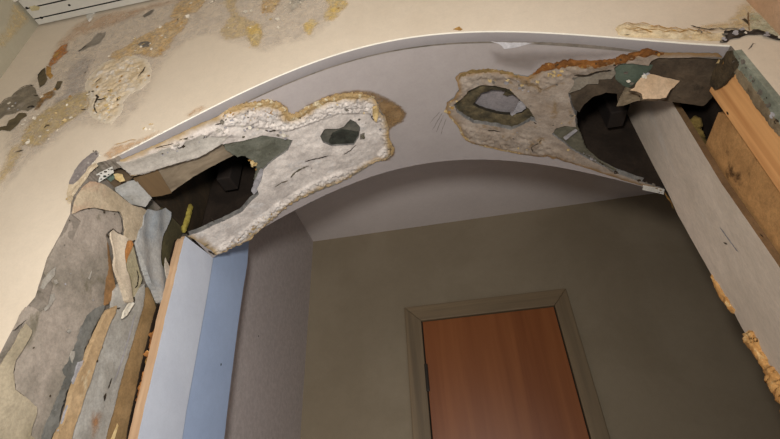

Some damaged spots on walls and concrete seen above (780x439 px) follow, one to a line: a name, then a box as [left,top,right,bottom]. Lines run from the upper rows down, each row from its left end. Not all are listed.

crack [719,12,780,43]
flaking render [749,13,780,36]
flaking render [116,92,394,255]
flaking render [445,52,722,191]
spalling [13,150,171,439]